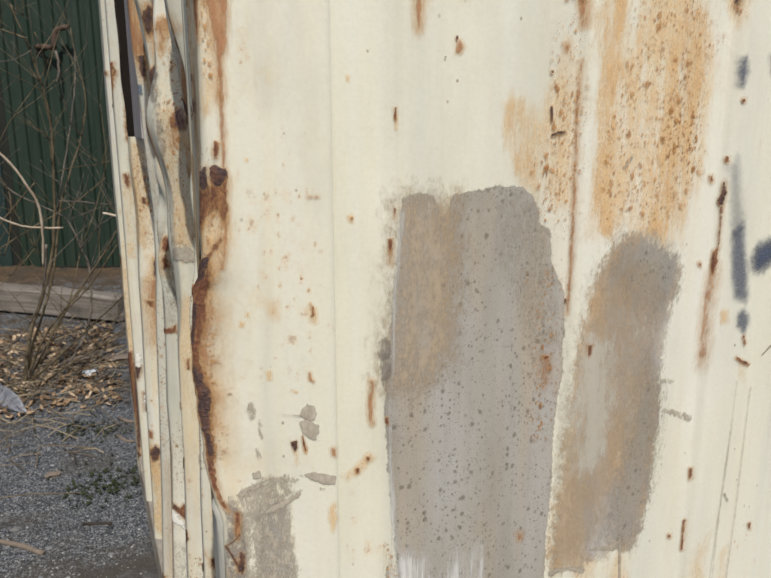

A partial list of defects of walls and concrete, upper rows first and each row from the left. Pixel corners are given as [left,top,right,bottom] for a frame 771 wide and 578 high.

corrosion [105,62,122,108]
corrosion [123,0,229,529]
corrosion [528,0,586,310]
corrosion [595,0,719,245]
corrosion [699,175,727,366]